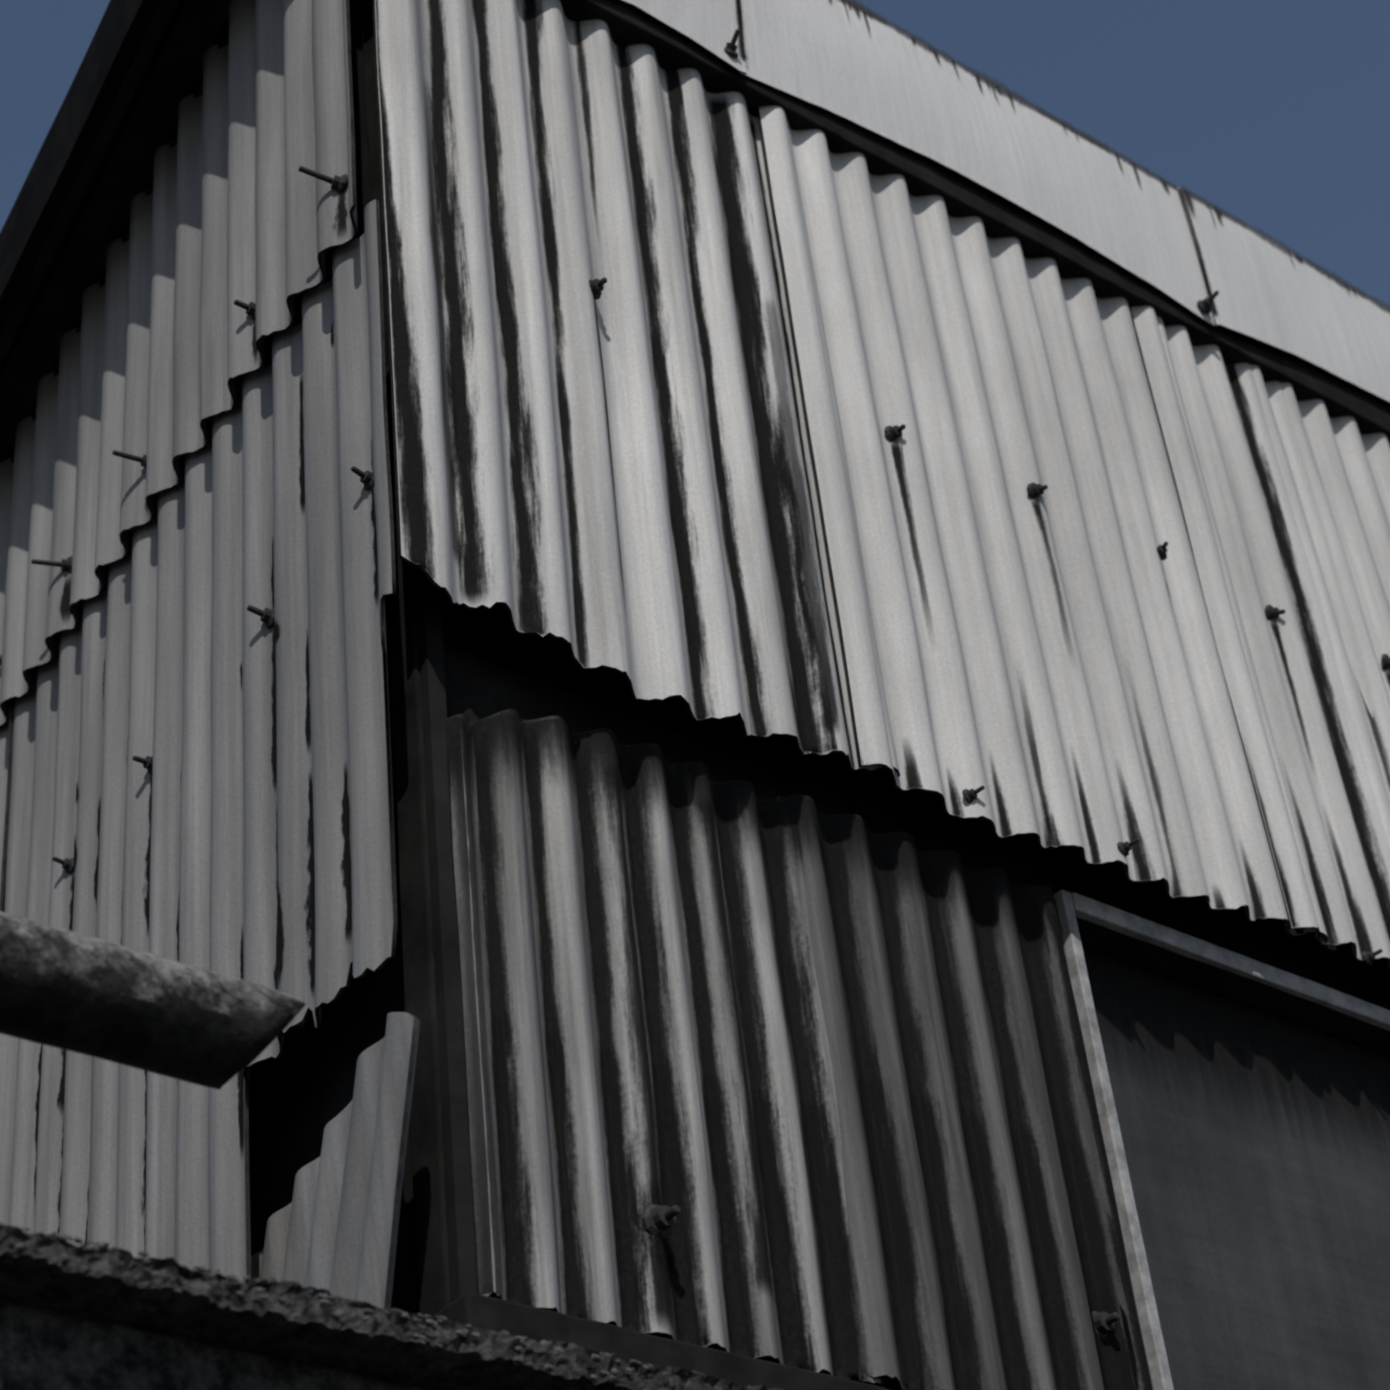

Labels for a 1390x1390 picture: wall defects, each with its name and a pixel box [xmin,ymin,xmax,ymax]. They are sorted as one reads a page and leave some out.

rust [376,0,434,577]
rust [428,0,487,598]
rust [472,0,546,634]
rust [523,0,588,667]
rust [617,44,707,719]
rust [665,69,767,736]
rust [709,99,863,768]
rust [1226,363,1390,960]
rust [525,745,591,1320]
rust [576,765,710,1346]
rust [670,790,875,1383]
rust [1013,901,1153,1390]